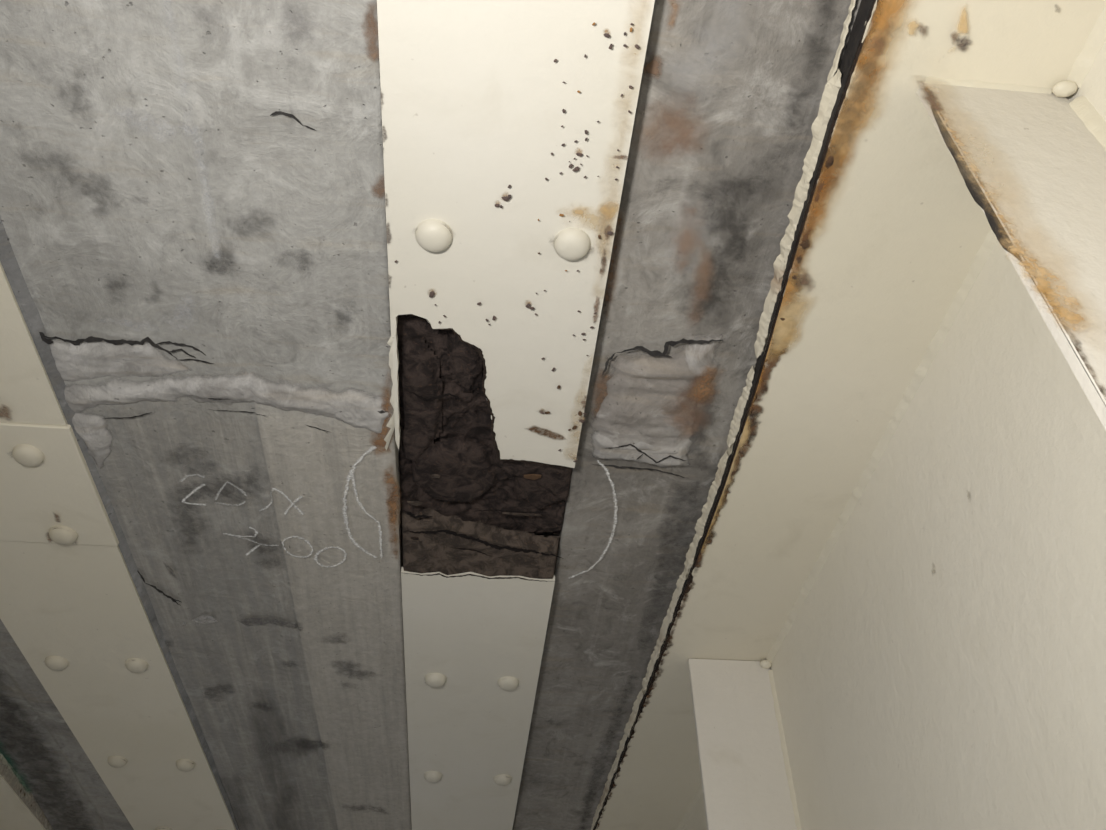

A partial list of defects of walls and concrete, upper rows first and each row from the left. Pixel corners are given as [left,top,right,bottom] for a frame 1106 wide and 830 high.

corrosion [592,22,640,49]
crack [270,111,315,130]
corrosion [806,0,927,228]
corrosion [545,130,599,181]
corrosion [559,203,622,303]
leakage [702,181,759,309]
crack [39,332,214,364]
crack [602,338,723,376]
corrosion [757,268,809,388]
crack [103,411,152,419]
crack [189,395,264,416]
spalling [397,314,566,534]